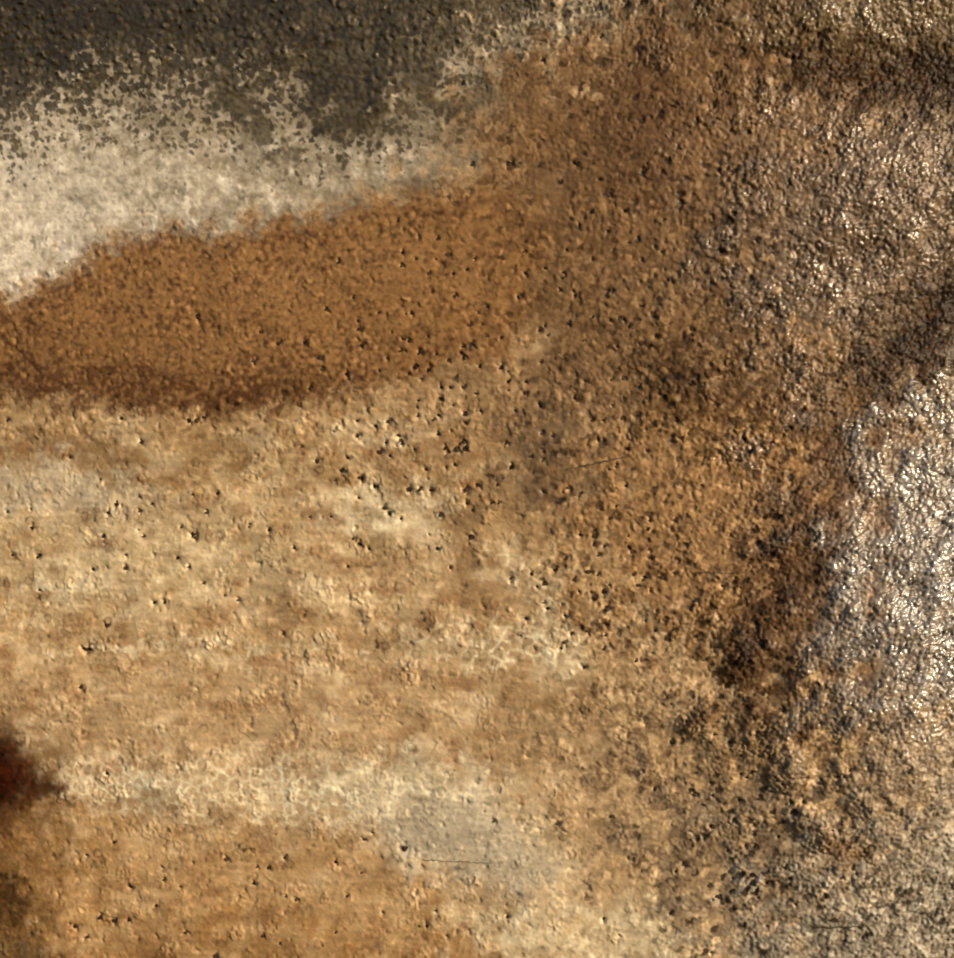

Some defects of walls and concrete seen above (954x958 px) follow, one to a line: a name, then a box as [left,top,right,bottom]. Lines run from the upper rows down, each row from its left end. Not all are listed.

water stain [810,203,836,221]
water stain [710,233,729,265]
water stain [732,234,763,259]
water stain [724,446,764,478]
water stain [316,473,464,561]
water stain [381,388,600,693]
water stain [827,569,847,583]
water stain [785,723,829,777]
corrosion [0,715,77,853]
corrosion [0,867,52,931]